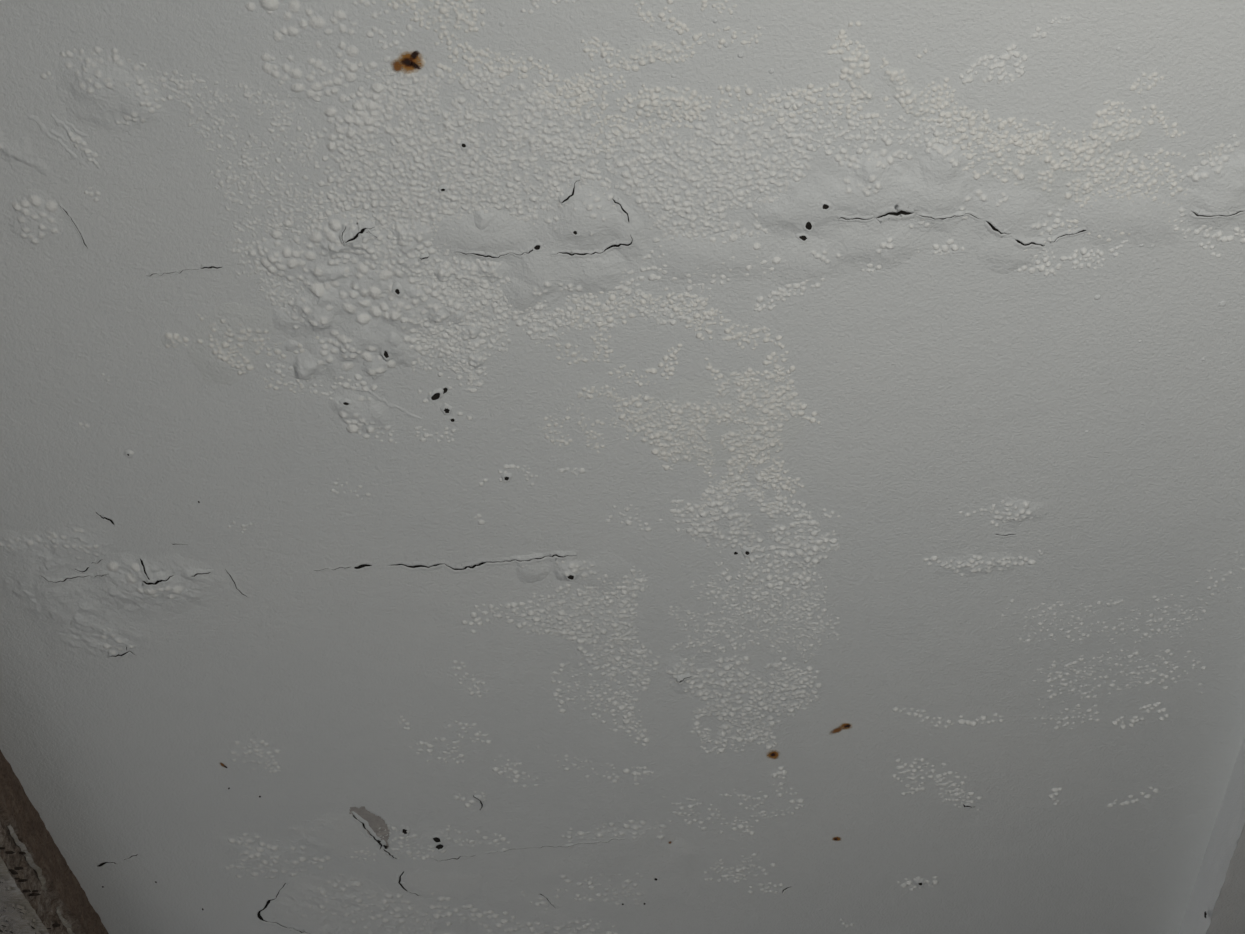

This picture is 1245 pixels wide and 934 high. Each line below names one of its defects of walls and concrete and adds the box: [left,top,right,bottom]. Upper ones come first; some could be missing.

rust [392,51,422,72]
crack [559,176,583,207]
crack [418,196,636,262]
crack [837,203,1087,251]
crack [1188,207,1245,219]
crack [312,550,577,574]
peeling [349,806,407,849]